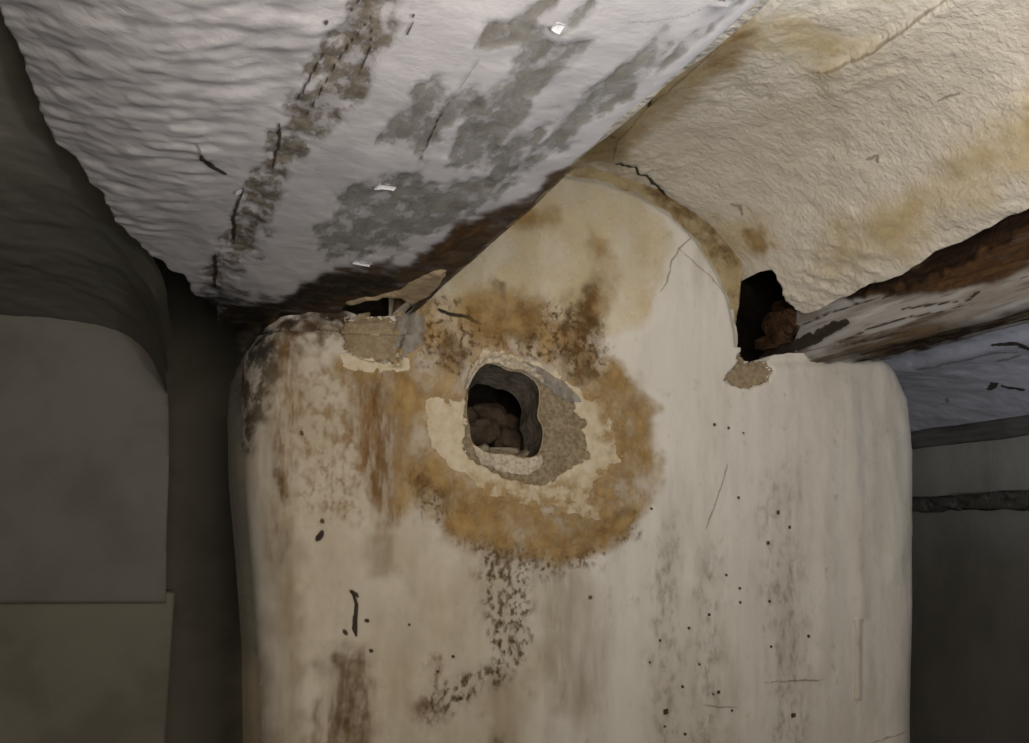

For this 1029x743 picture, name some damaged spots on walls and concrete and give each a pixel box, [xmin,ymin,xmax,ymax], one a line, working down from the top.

peeling [206,0,415,285]
peeling [313,0,686,267]
spalling [339,269,447,373]
leakage [205,33,750,712]
spalling [425,349,631,527]
spalling [724,270,784,389]